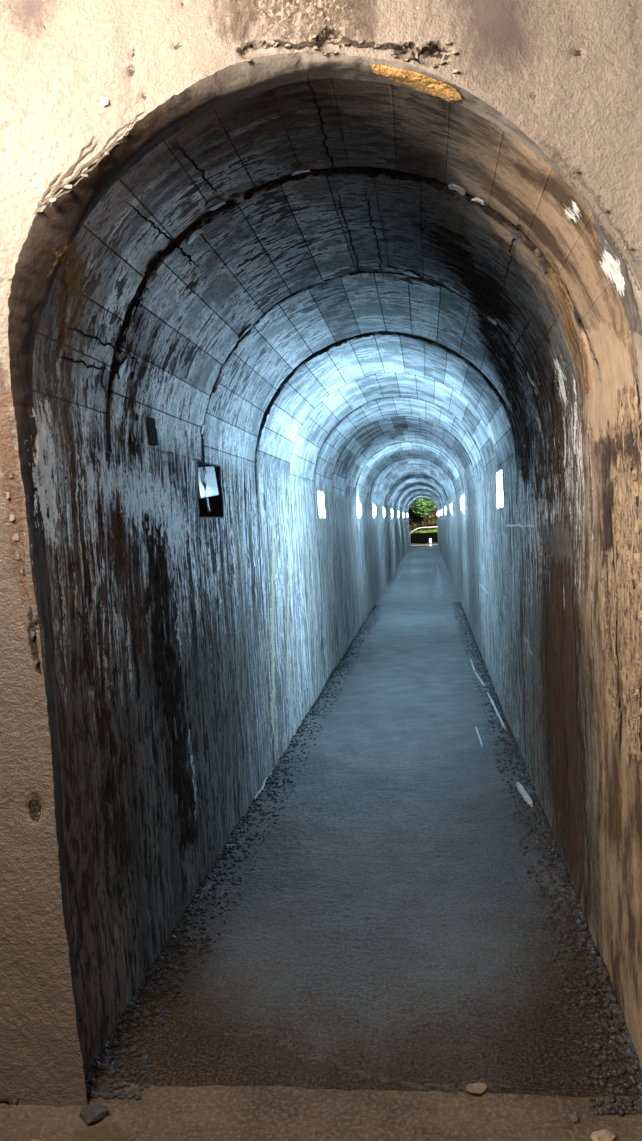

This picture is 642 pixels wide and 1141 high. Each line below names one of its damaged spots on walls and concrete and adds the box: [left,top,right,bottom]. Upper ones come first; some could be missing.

peeling [101,166,554,468]
leakage [564,201,641,334]
leakage [24,391,199,667]
peeling [200,206,642,766]
leakage [535,350,596,921]
leakage [597,481,615,580]
leakage [188,729,197,821]